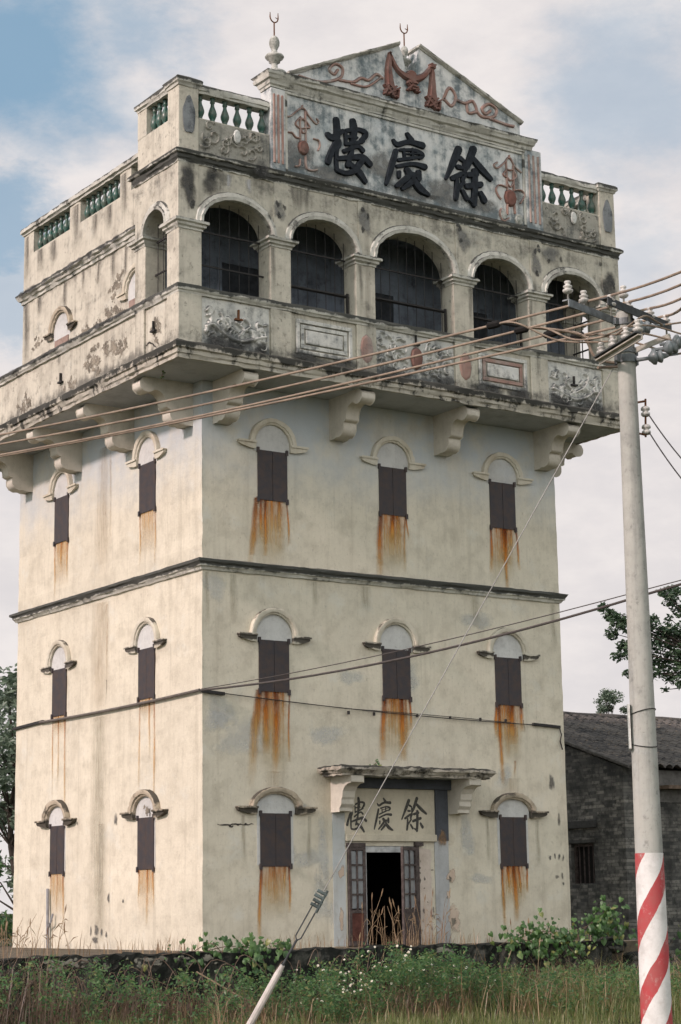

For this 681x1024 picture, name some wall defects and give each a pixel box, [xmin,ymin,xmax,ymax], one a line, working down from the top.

rust [252,498,290,546]
rust [378,514,409,563]
rust [490,528,519,579]
rust [252,691,290,758]
rust [381,698,412,746]
rust [494,705,523,766]
crack [217,821,252,829]
rust [258,867,291,925]
rust [501,866,528,909]